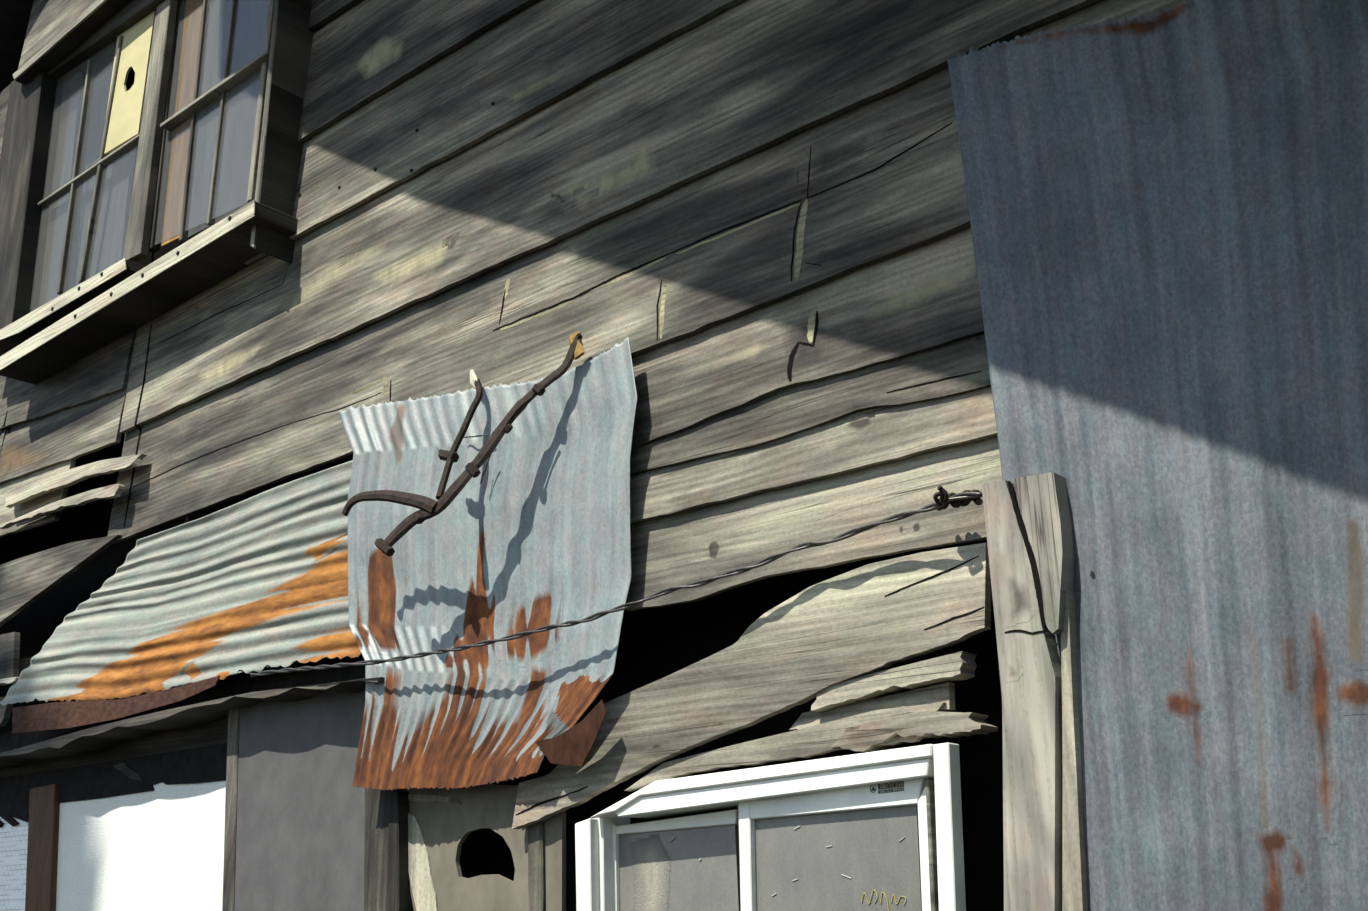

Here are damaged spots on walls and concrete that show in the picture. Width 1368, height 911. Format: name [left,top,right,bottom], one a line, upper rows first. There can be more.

crack [493,122,952,382]
rust [40,496,614,791]
crack [885,556,979,597]
crack [924,481,1049,634]
rust [1162,642,1211,773]
rust [1252,511,1368,911]